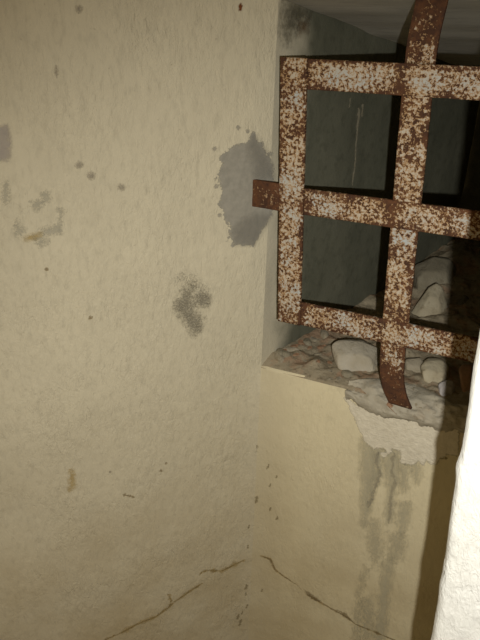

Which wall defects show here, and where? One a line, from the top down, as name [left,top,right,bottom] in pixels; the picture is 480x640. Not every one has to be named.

flaking render [344,397,459,465]
crack [307,593,393,640]